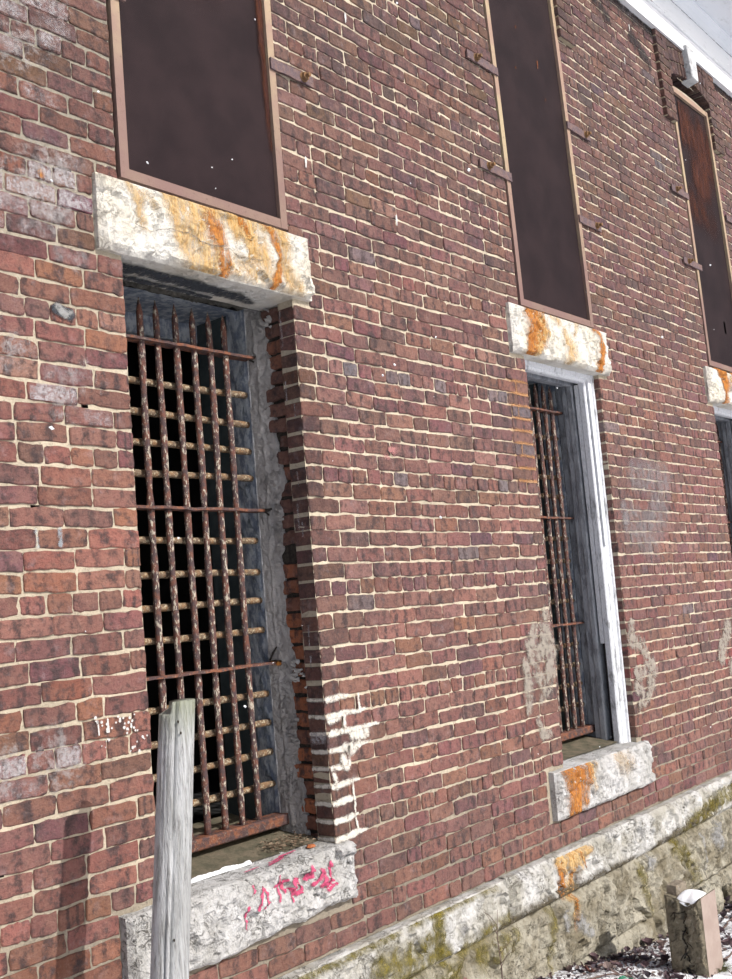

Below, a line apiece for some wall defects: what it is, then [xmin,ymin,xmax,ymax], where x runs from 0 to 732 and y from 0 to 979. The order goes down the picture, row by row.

corrosion [161,192,292,290]
corrosion [523,306,577,365]
corrosion [593,329,606,373]
corrosion [714,368,732,404]
corrosion [564,761,596,817]
damp [651,804,717,877]
corrosion [555,845,593,920]
damp [305,934,396,979]
damp [410,857,647,979]
crack [670,911,693,963]